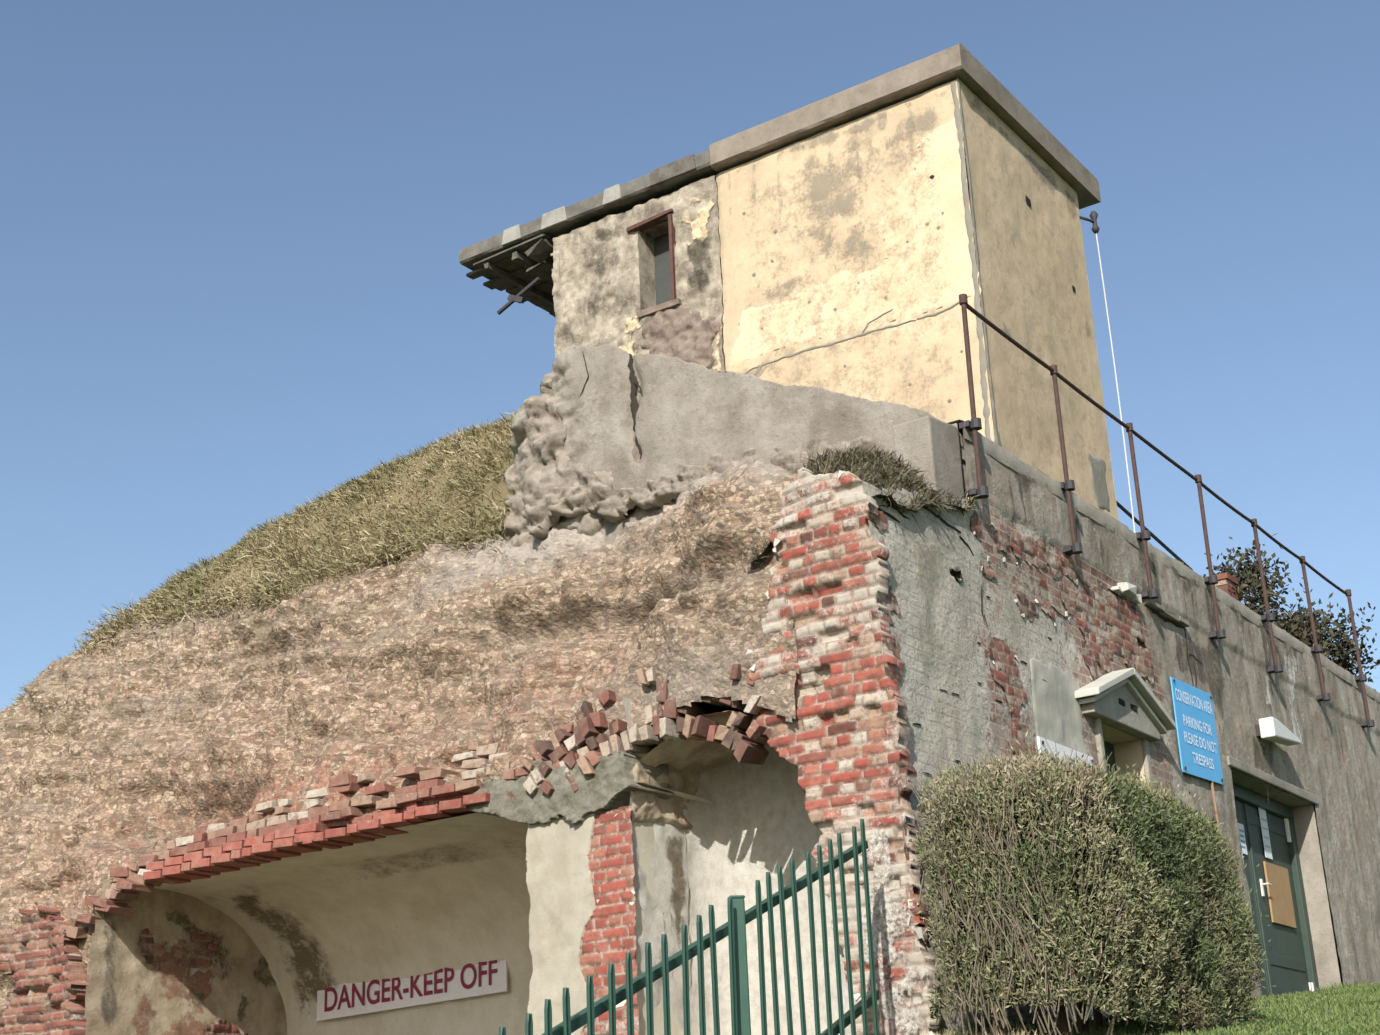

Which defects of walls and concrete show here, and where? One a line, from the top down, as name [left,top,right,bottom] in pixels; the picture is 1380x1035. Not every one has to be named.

leakage [791,118,874,251]
leakage [889,111,935,156]
flaking render [551,175,725,371]
crack [744,81,999,445]
crack [579,351,589,397]
crack [628,354,643,459]
spalling [503,386,876,548]
crack [878,505,988,627]
spalling [971,508,1154,685]
spalling [988,637,1036,756]
spalling [614,745,701,830]
peeling [853,795,935,1035]